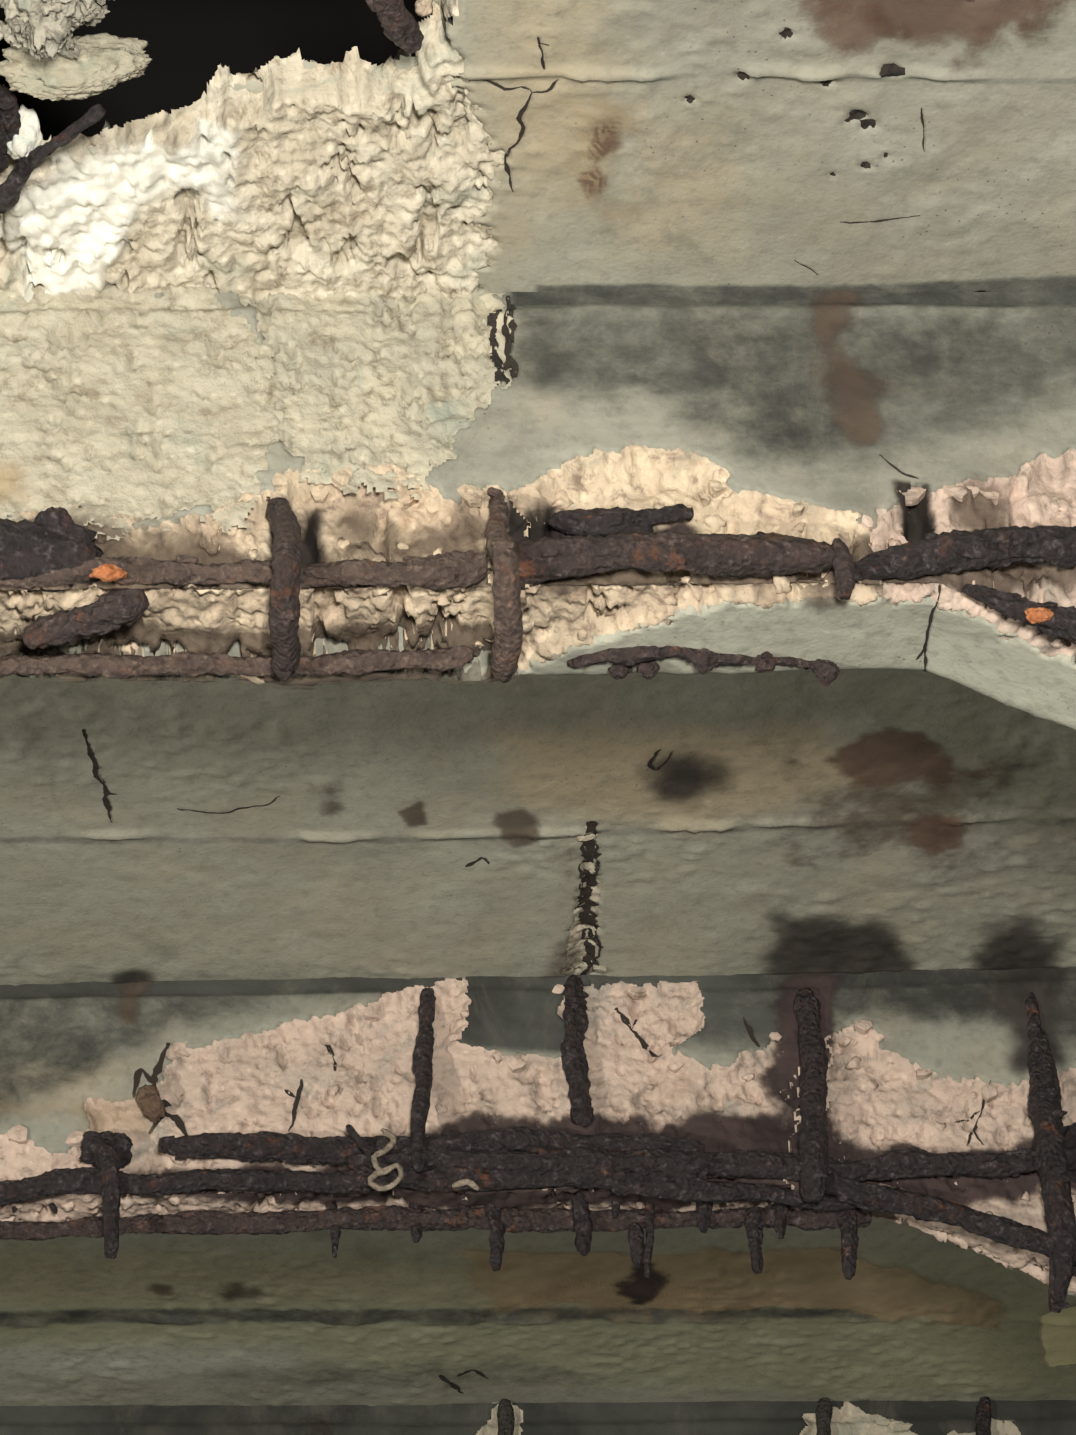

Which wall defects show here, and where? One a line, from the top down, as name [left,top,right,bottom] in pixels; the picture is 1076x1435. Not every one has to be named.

crack [452,37,558,192]
spalling [0,0,1076,684]
corrosion [0,506,270,593]
corrosion [546,506,653,537]
corrosion [0,618,275,658]
corrosion [263,612,498,688]
spalling [0,862,1053,1285]
corrosion [425,917,911,1155]
spalling [1058,1068,1076,1126]
corrosion [174,1186,688,1211]
peeling [465,1248,998,1329]
spalling [800,1402,917,1435]